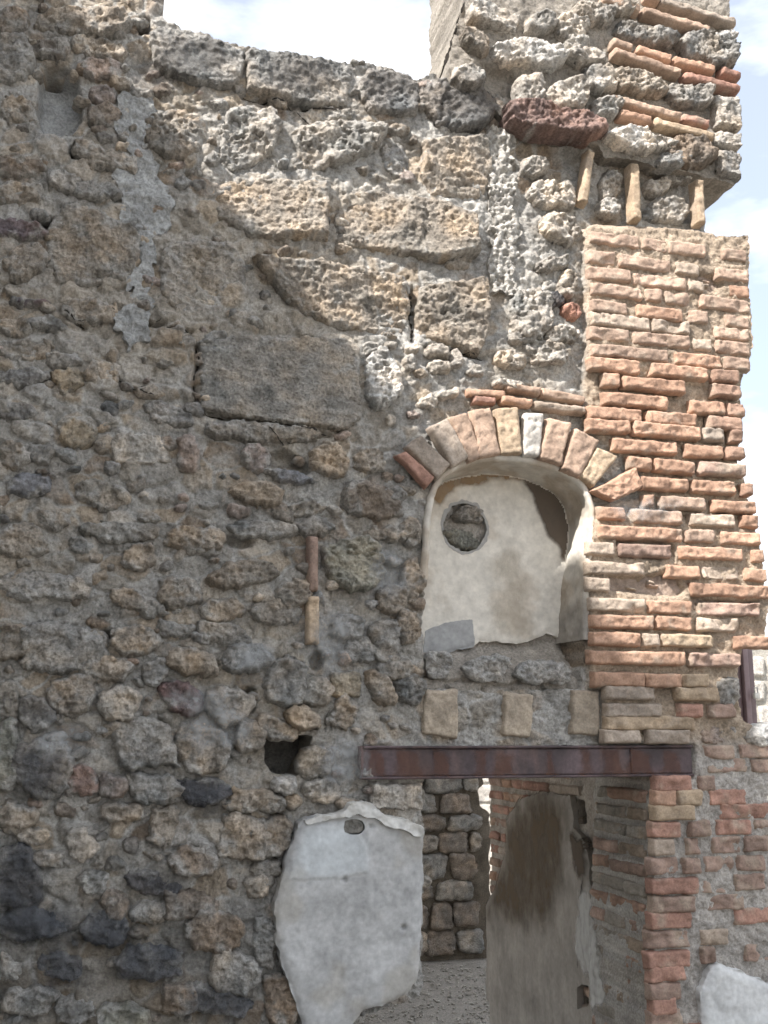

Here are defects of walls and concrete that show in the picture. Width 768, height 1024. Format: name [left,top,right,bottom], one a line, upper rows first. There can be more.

crack [408,294,482,364]
damp [493,798,592,920]